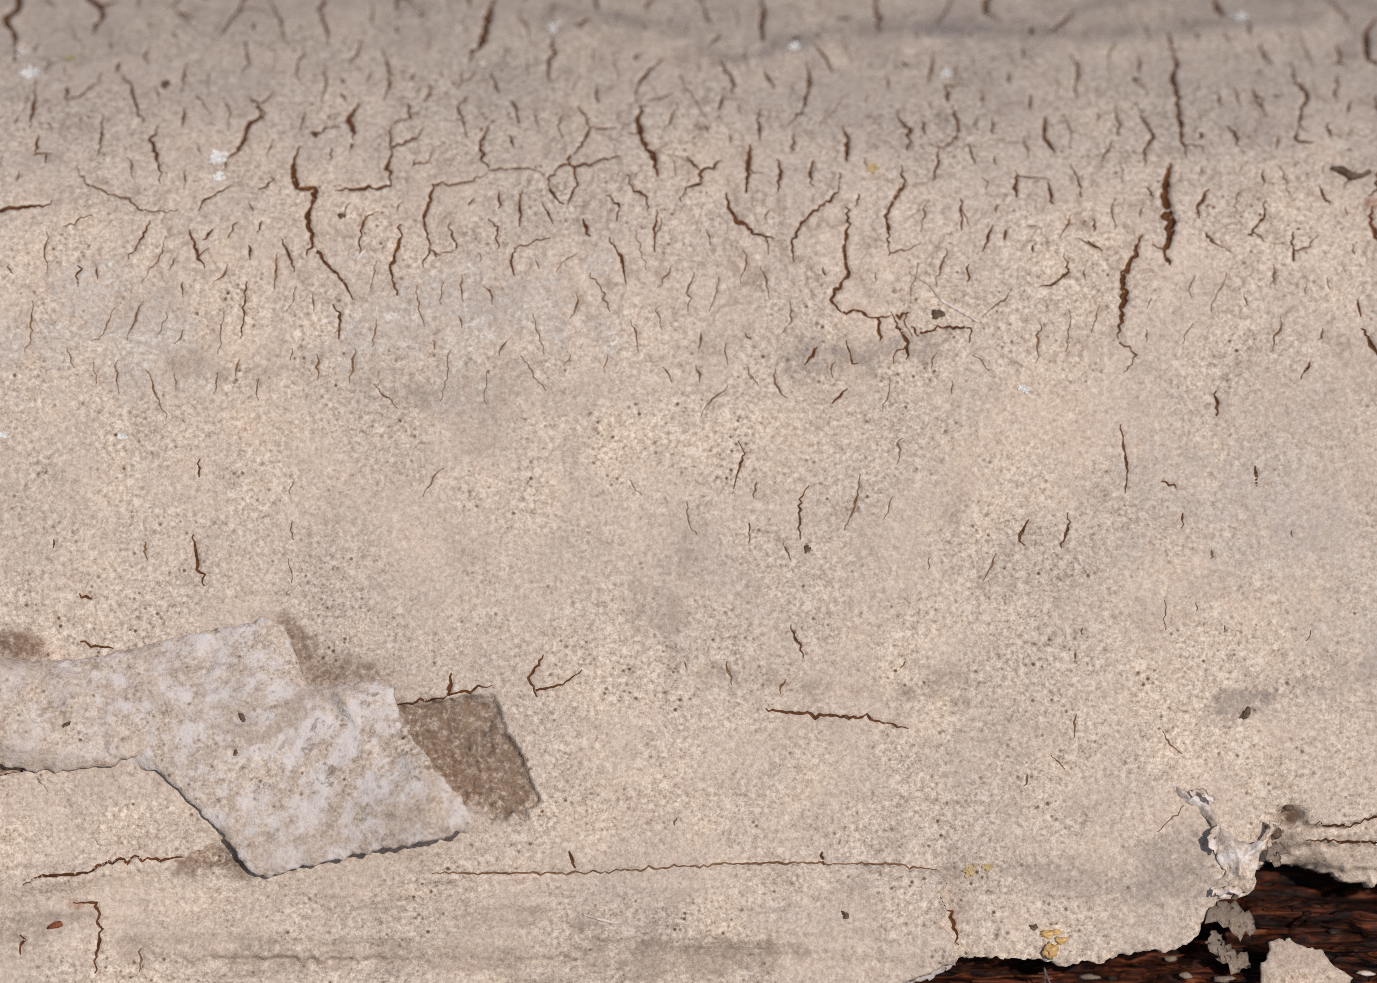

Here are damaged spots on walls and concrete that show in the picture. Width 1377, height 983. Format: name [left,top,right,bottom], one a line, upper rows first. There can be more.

crack [0,0,1377,418]
crack [192,534,206,586]
crack [733,441,809,560]
crack [844,438,904,530]
crack [983,519,1029,581]
crack [1060,512,1071,548]
crack [1120,424,1129,493]
crack [765,624,909,729]
crack [1024,714,1077,786]
peeling [1175,785,1289,899]
crack [1306,815,1377,844]
crack [432,851,959,945]